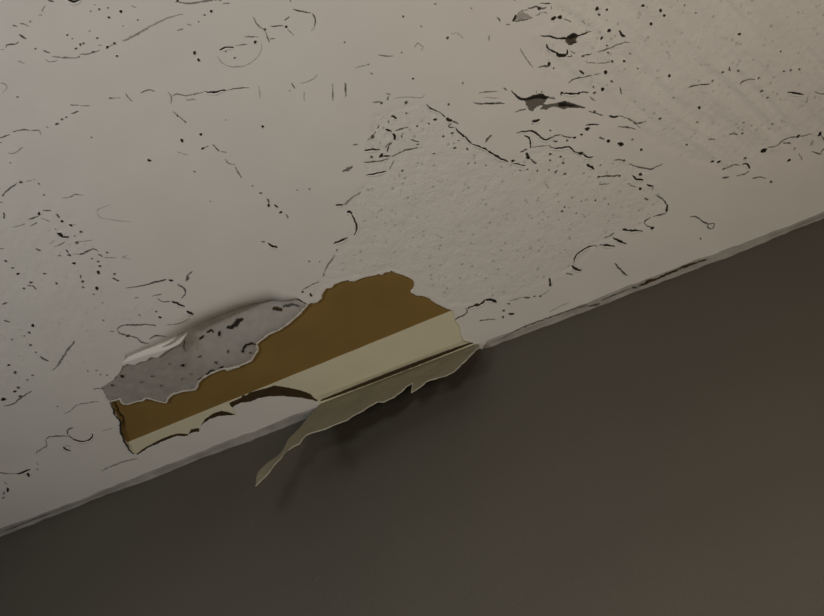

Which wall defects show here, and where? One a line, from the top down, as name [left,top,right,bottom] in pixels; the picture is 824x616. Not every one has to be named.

crack [6,0,83,46]
crack [514,0,585,24]
crack [520,44,621,101]
crack [108,87,246,124]
flaking render [504,88,618,118]
flaking render [353,100,430,177]
crack [1,181,51,226]
crack [425,104,670,298]
crack [57,249,193,344]
peeling [101,192,360,405]
crack [455,298,497,320]
crack [503,216,715,338]